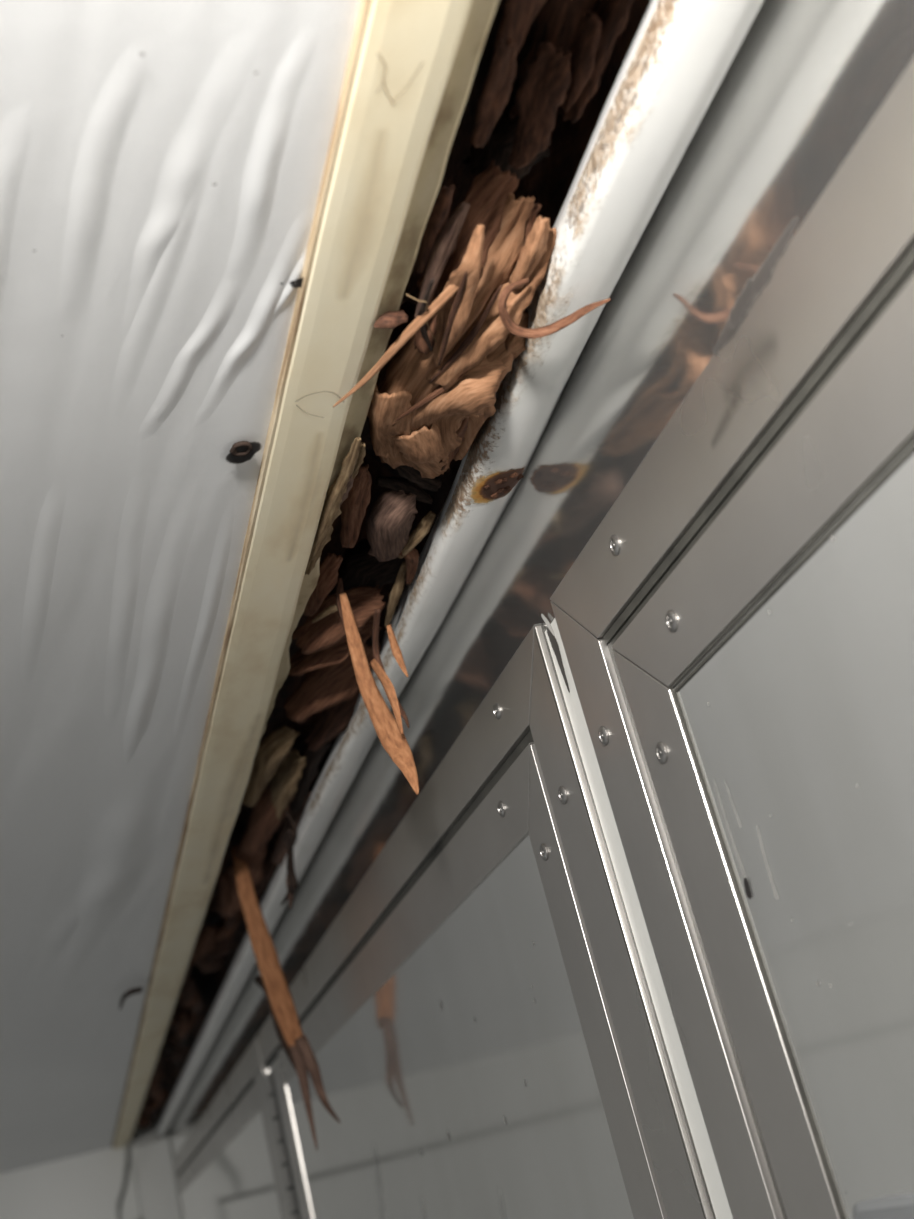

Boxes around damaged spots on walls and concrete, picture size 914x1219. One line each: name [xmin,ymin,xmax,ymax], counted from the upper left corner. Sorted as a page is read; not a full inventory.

peeling [217,160,557,917]
corrosion [445,273,559,524]